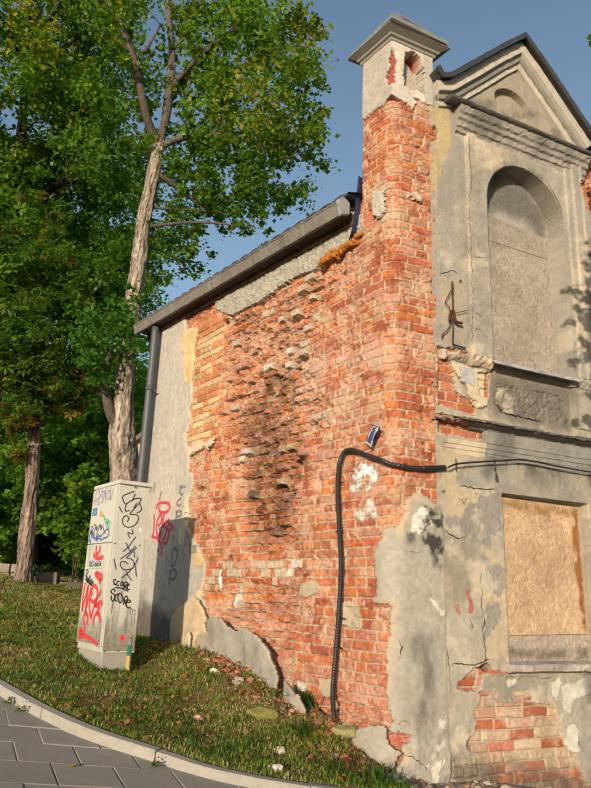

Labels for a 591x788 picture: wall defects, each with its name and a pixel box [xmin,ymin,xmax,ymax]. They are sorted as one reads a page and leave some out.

crack [441,139,486,339]
flaking render [580,161,591,213]
spalling [178,51,482,772]
crack [447,573,490,685]
flaking render [449,662,591,788]